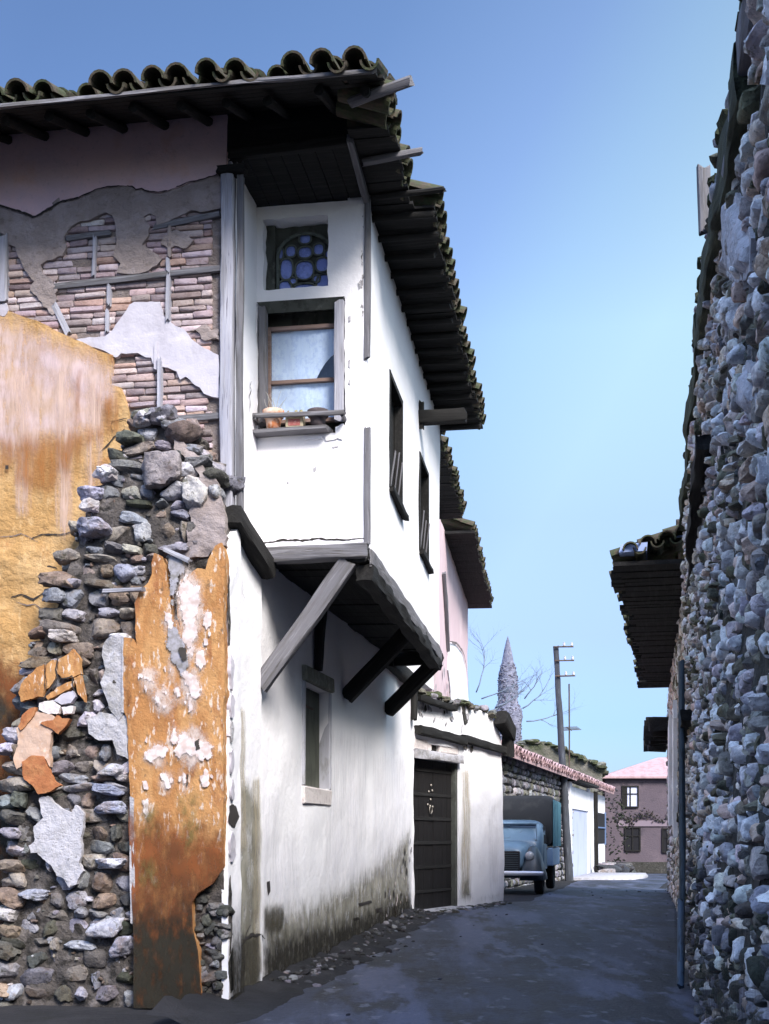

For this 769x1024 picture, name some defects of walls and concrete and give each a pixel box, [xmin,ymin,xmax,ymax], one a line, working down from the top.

flaking render [0,174,221,452]
crack [2,532,70,542]
damp [56,371,69,532]
efflorescence [89,385,101,486]
peeling [138,555,214,789]
peeling [13,649,87,888]
damp [133,909,201,1008]
rust [128,820,224,1005]
damp [232,710,411,1000]